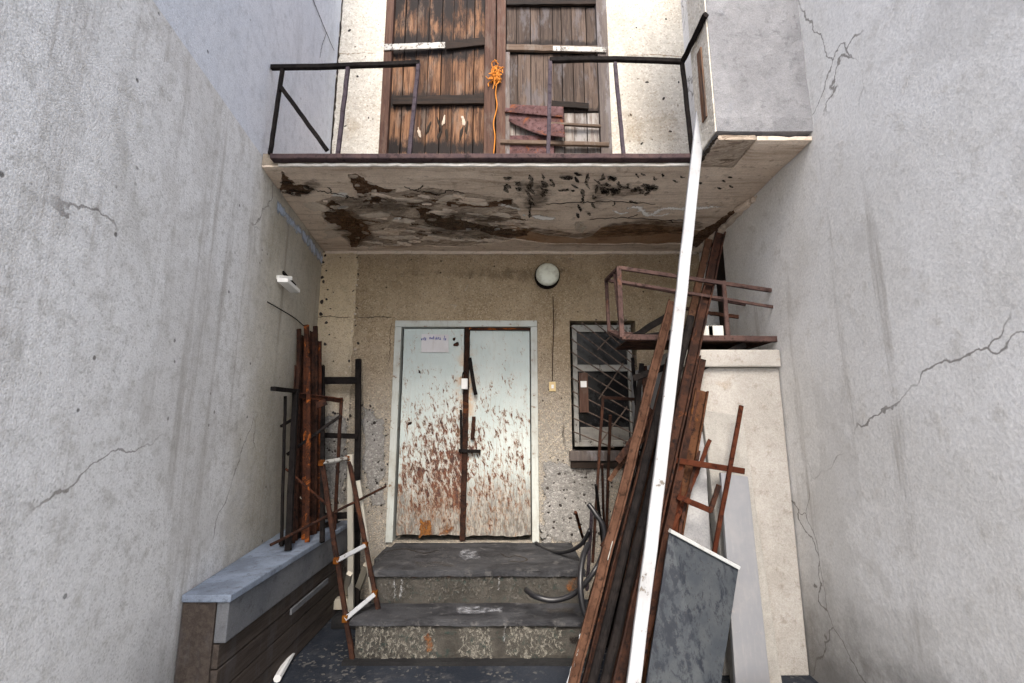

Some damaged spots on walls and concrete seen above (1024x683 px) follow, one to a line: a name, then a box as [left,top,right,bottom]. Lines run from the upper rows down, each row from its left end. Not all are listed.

water stain [334,172,718,244]
flaking render [277,171,530,513]
rust [419,519,454,538]
flaking render [541,457,613,543]